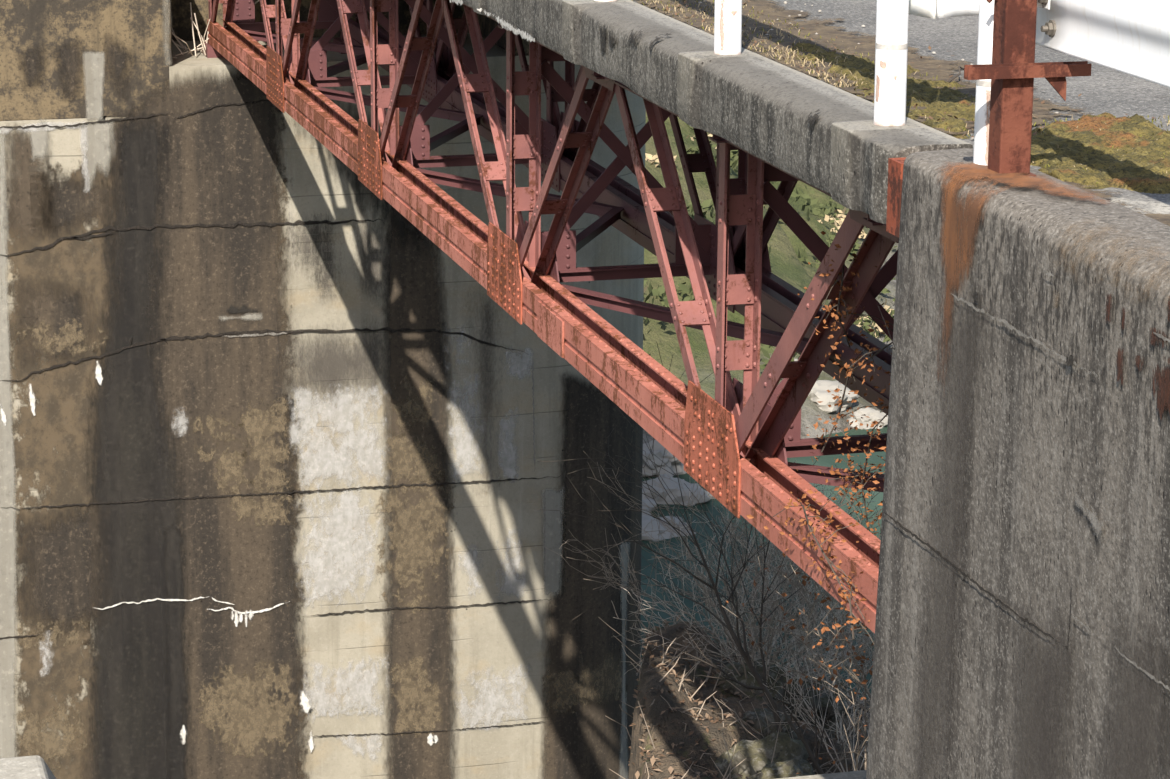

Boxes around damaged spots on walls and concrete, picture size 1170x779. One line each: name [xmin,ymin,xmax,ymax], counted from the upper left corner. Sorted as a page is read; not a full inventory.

crack [0,633,39,641]
leakage [0,42,525,779]
crack [1,327,560,617]
leakage [542,376,643,779]
rust [942,90,1105,340]
rust [1105,294,1125,330]
rust [1116,297,1170,420]